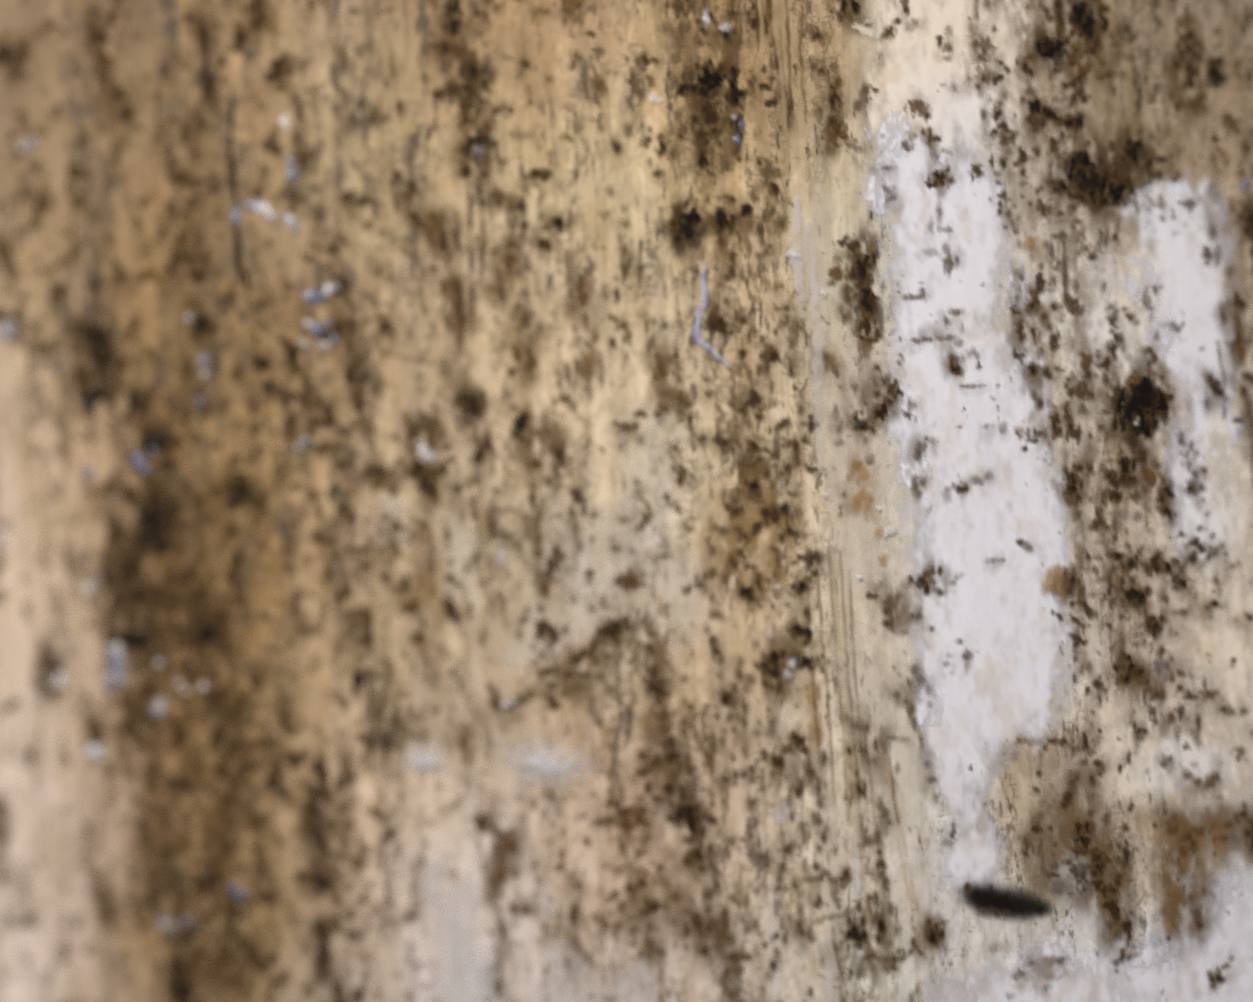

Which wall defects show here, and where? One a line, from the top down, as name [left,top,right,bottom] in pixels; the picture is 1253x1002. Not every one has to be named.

water stain [885,0,909,36]
water stain [646,5,793,173]
water stain [814,65,878,151]
water stain [905,100,941,144]
water stain [115,0,272,367]
water stain [925,168,953,188]
water stain [669,182,779,276]
water stain [852,366,910,434]
water stain [949,358,975,387]
water stain [972,0,1250,739]
water stain [0,231,396,1002]
water stain [909,565,943,594]